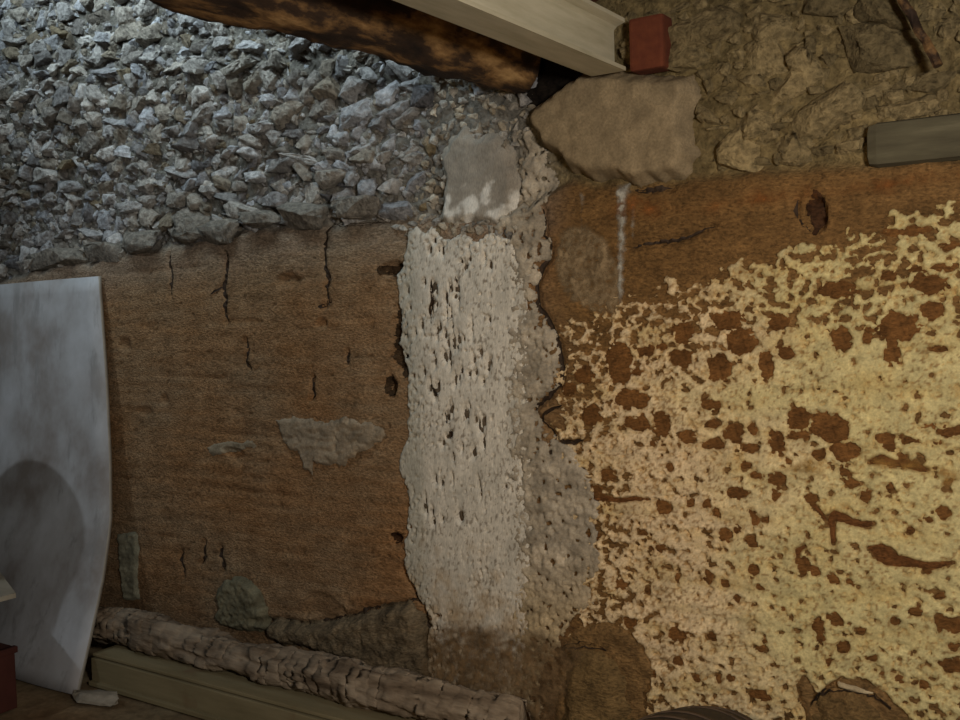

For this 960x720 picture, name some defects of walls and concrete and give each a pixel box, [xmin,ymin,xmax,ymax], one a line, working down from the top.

crack [210,253,229,321]
crack [318,221,385,309]
leakage [557,184,629,313]
crack [631,226,715,249]
flaking render [831,263,959,367]
flaking render [562,308,872,503]
flaking render [870,423,960,472]
flaking render [687,498,769,547]
flaking render [804,492,873,543]
flaking render [868,544,952,575]
flaking render [934,592,960,673]
flaking render [797,655,912,720]